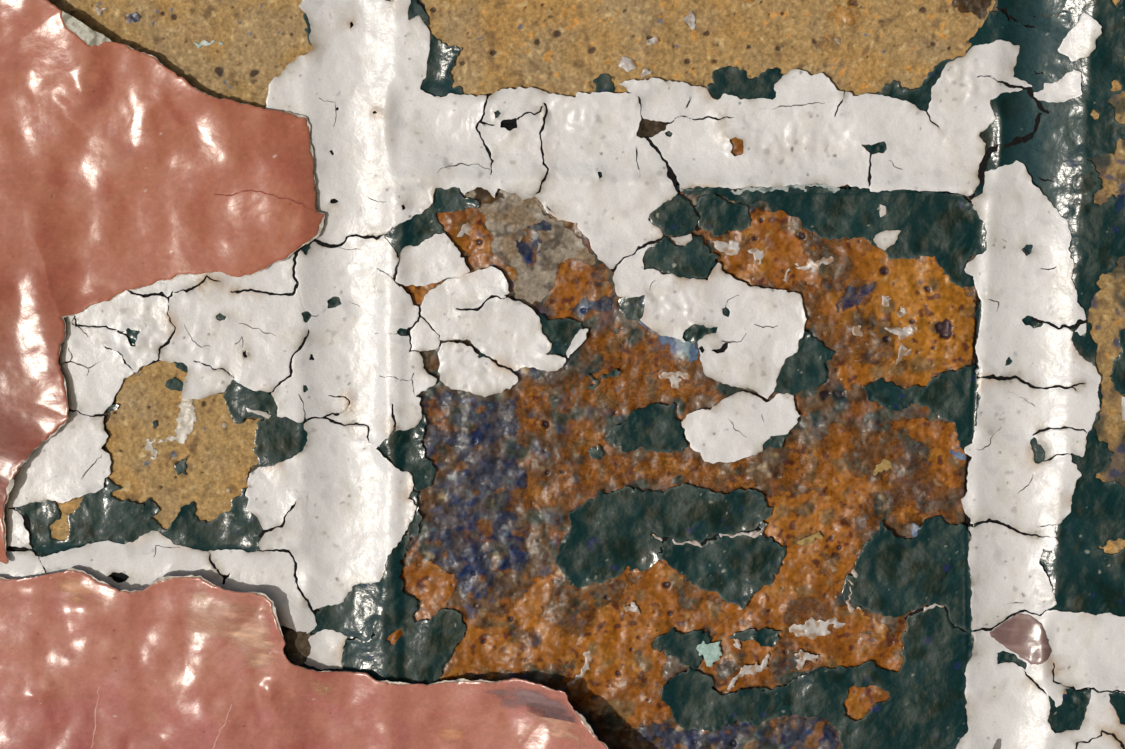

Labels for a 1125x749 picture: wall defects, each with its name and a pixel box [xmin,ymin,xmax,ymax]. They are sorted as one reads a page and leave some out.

crack [439,94,549,194]
peeling [265,0,1032,399]
crack [636,98,734,231]
crack [969,72,1052,200]
crack [63,189,421,463]
peeling [0,0,608,749]
rust [398,180,979,749]
peeling [681,391,800,464]
crack [977,374,1087,494]
crack [1031,317,1087,329]
crack [259,502,315,634]
rust [386,629,403,645]